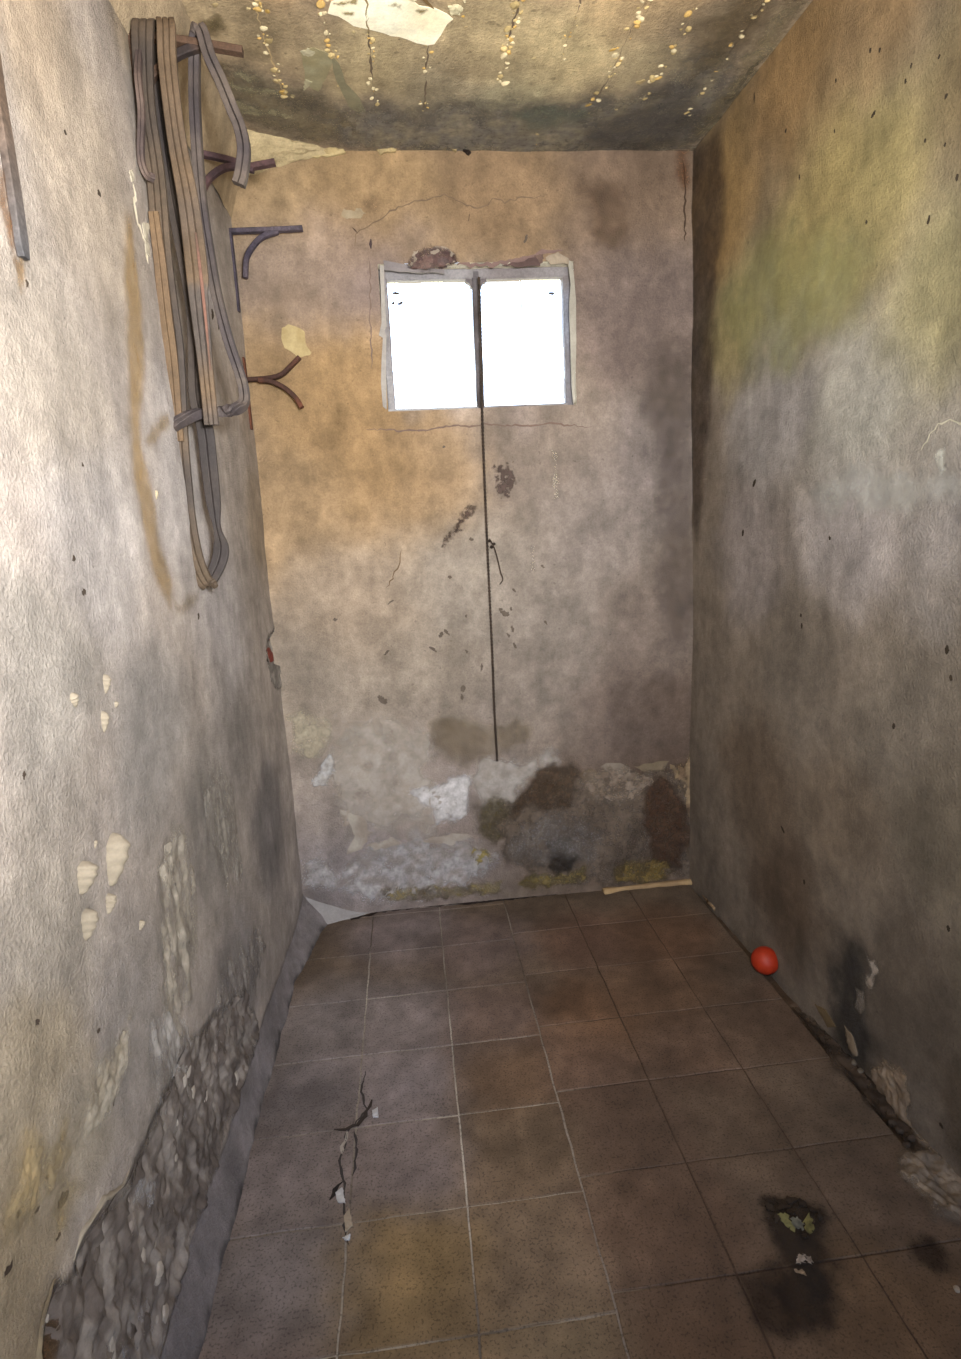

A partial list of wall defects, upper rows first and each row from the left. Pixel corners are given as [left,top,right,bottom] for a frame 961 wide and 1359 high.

peeling [328,0,466,45]
damp [221,49,738,152]
crack [559,0,581,70]
crack [591,0,701,103]
crack [352,194,545,367]
flaking render [379,234,576,409]
peeling [499,588,517,648]
flaking render [677,755,690,817]
flaking render [7,1133,69,1242]
flaking render [36,833,260,1359]
crack [329,1071,373,1245]
flaking render [870,1061,934,1152]